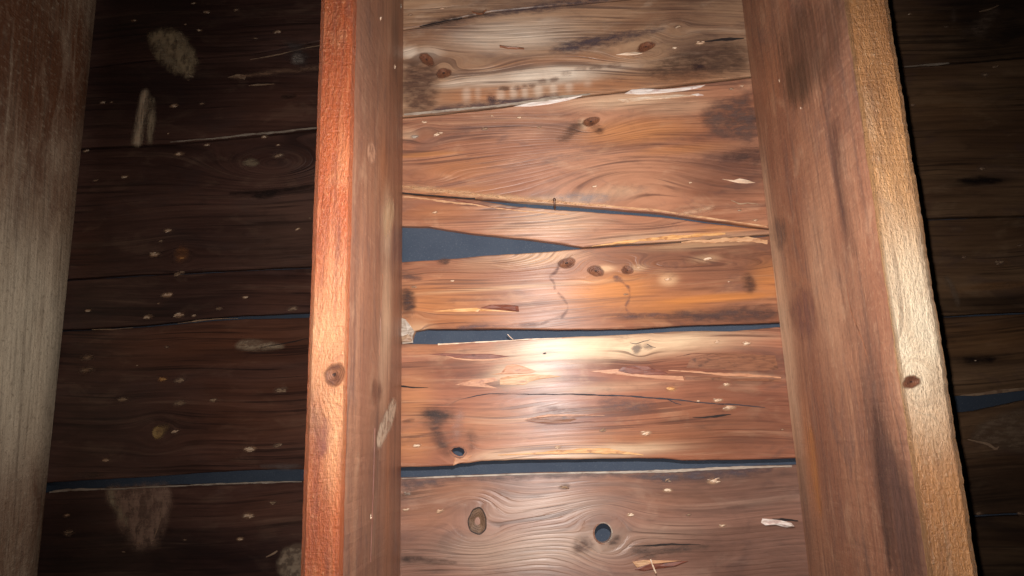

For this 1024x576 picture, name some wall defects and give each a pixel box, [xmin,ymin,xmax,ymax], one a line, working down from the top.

water stain [134,90,155,146]
crack [402,186,767,227]
crack [401,385,765,418]